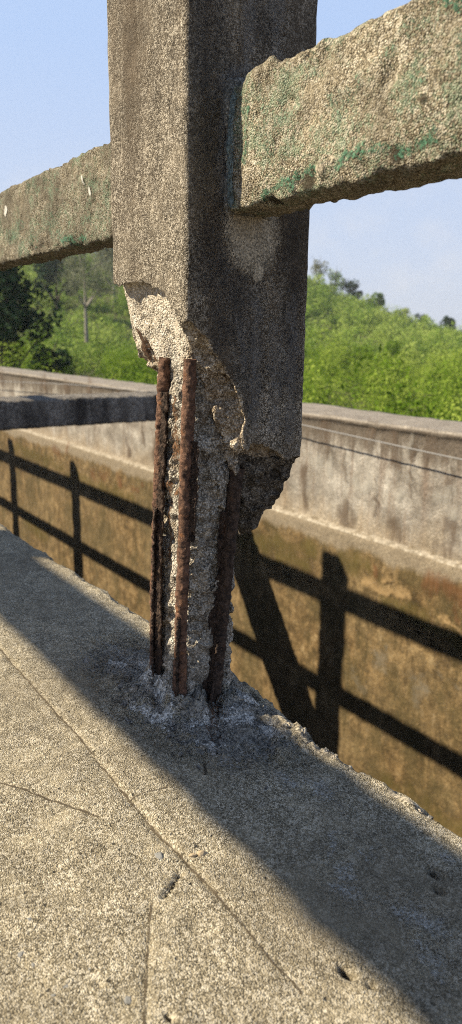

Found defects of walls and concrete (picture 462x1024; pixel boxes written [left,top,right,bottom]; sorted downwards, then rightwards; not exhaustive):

corrosion [165,477,180,562]
spalling [77,281,371,778]
crack [0,649,302,994]
spalling [389,789,440,824]
crack [143,904,152,1024]